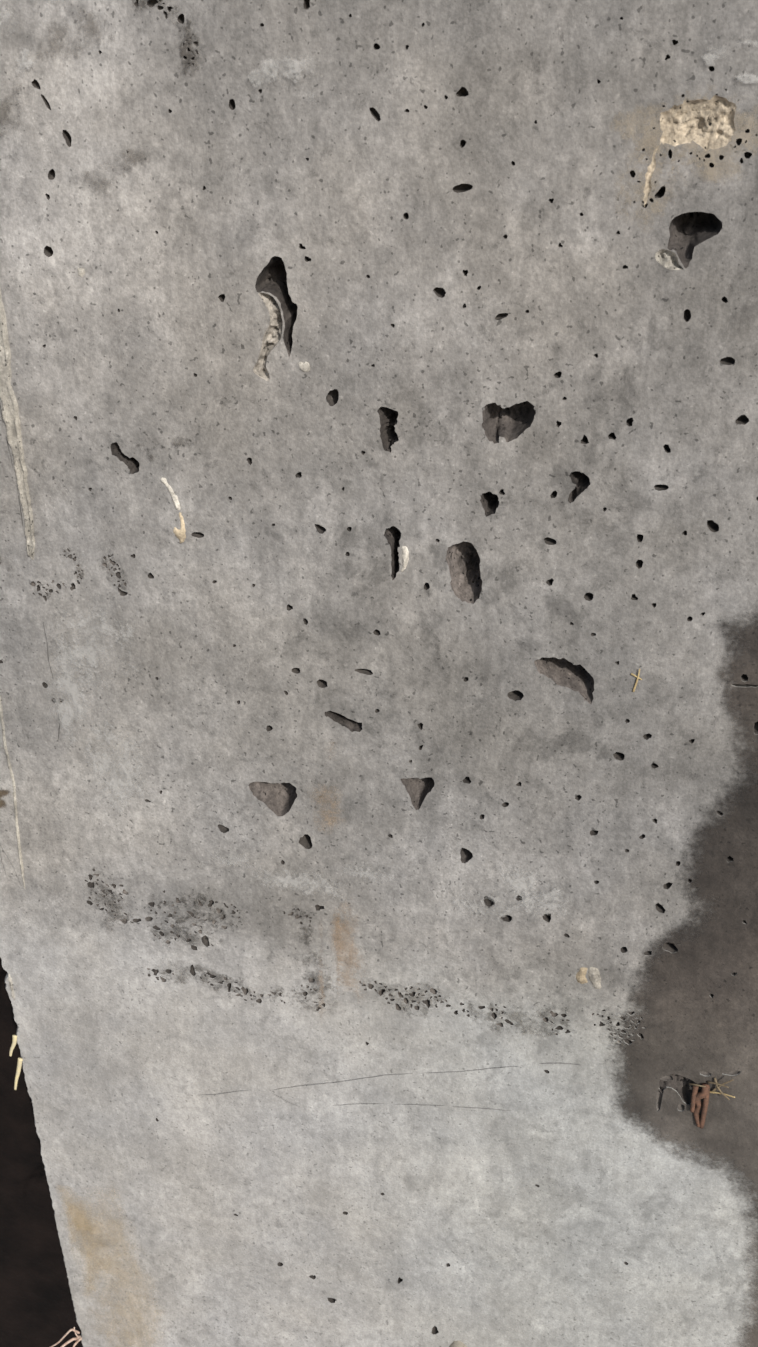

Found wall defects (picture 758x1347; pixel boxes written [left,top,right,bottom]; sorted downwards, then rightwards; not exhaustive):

peeling [616,89,758,270]
water stain [616,619,758,1347]